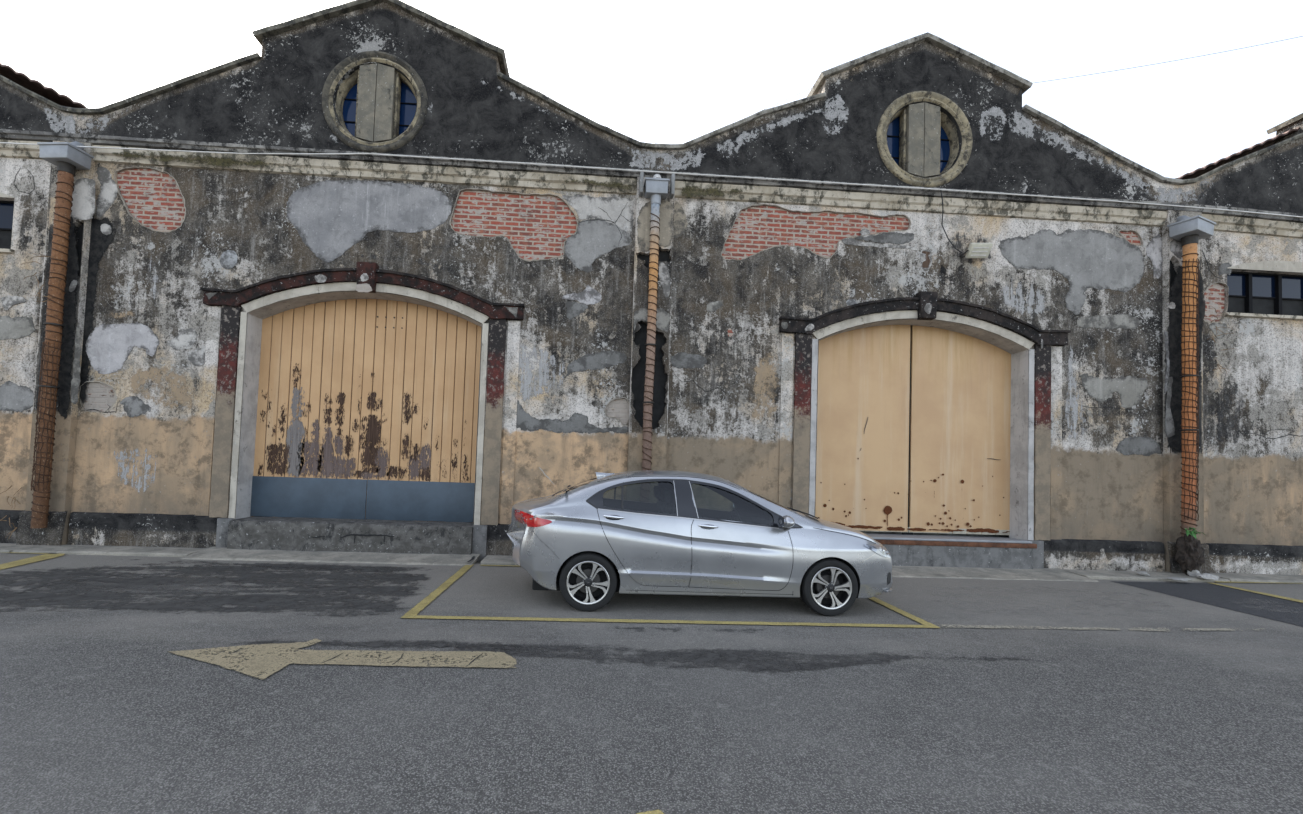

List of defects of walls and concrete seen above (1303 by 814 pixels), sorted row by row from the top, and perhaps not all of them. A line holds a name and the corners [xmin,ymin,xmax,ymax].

flaking render [69,166,186,306]
flaking render [450,188,578,262]
flaking render [721,204,932,270]
water stain [57,216,116,419]
peeling [258,364,469,481]
water stain [752,353,779,419]
rust [818,474,1037,549]